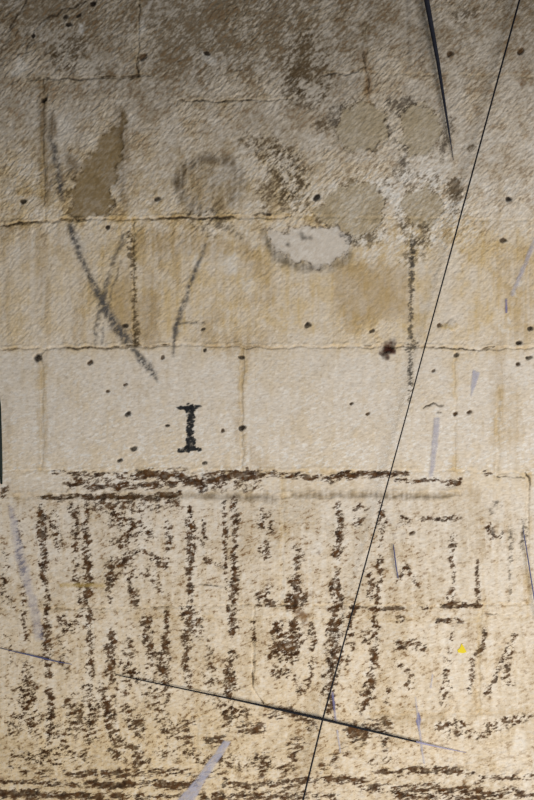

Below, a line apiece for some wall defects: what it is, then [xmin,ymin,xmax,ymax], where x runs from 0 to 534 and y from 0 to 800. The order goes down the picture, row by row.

peeling [67,113,127,218]
corrosion [380,341,396,360]